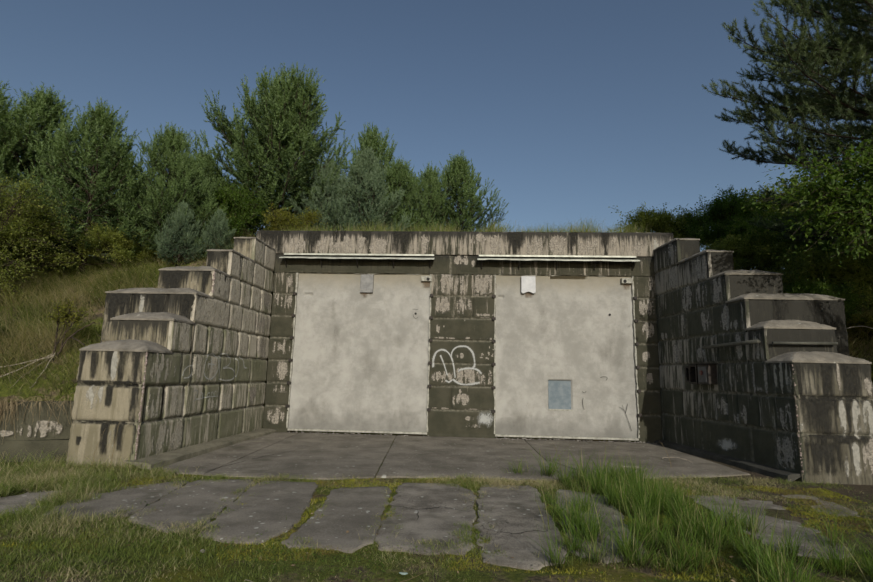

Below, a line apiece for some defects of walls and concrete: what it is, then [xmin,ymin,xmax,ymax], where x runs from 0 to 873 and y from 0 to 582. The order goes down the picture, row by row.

leakage [392,231,412,253]
leakage [507,232,523,255]
leakage [568,232,577,254]
peeling [434,255,497,321]
peeling [639,276,743,363]
leakage [807,300,843,329]
peeling [0,420,62,437]
leakage [77,351,143,454]
peeling [134,323,248,460]
peeling [273,339,290,392]
peeling [431,338,494,428]
leakage [774,363,873,476]